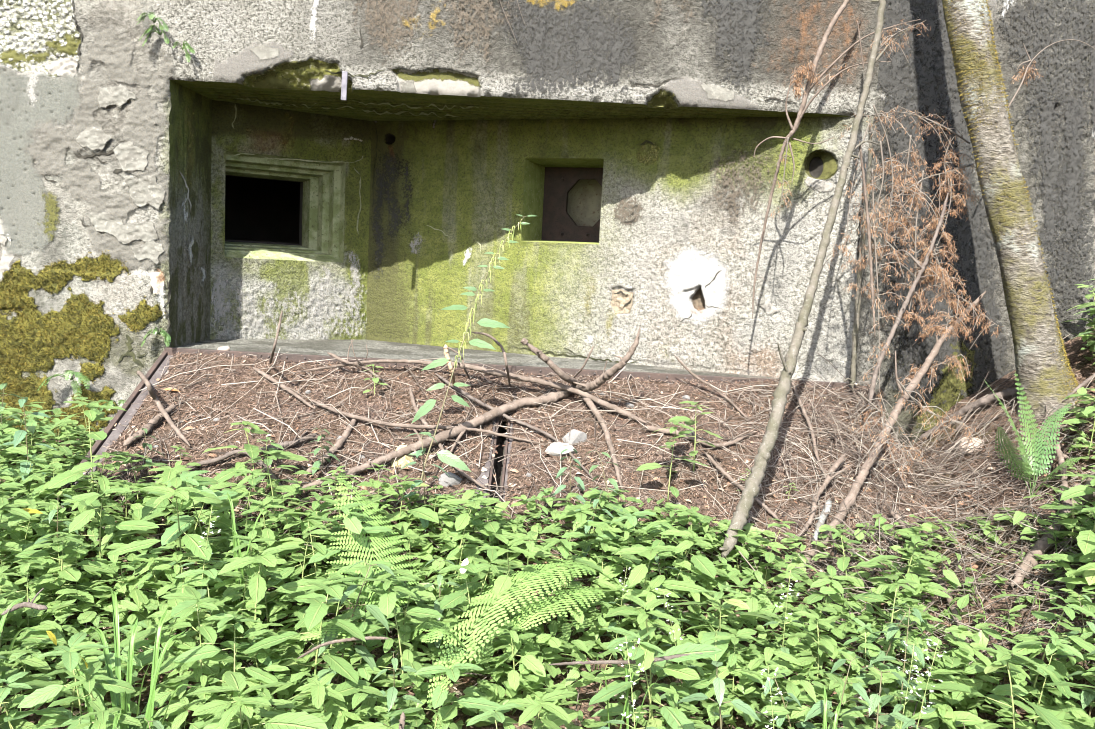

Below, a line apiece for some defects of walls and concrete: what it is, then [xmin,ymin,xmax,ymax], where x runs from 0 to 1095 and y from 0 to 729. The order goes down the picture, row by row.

spalling [213,42,352,93]
spalling [389,69,481,97]
peeling [0,0,174,268]
leakage [189,148,448,340]
spalling [664,246,730,322]